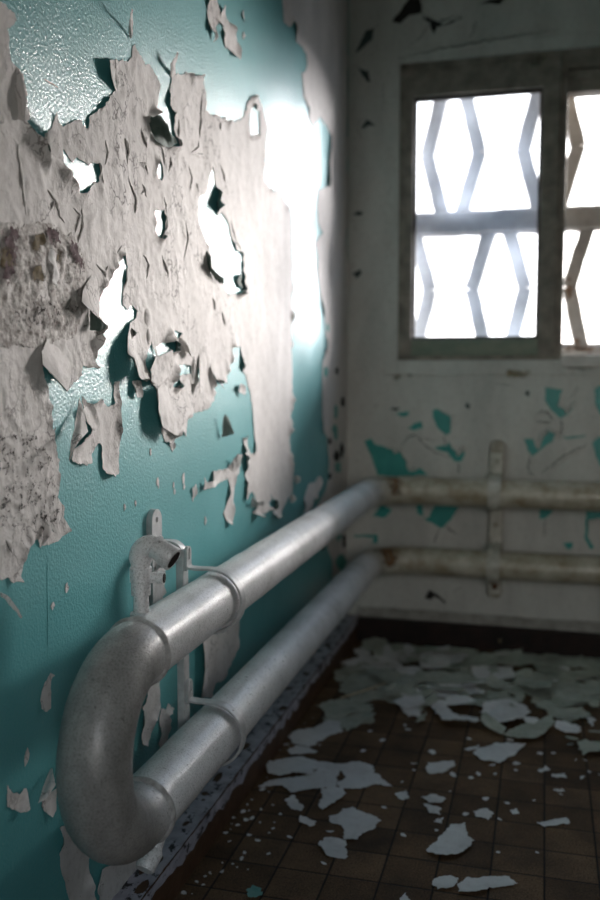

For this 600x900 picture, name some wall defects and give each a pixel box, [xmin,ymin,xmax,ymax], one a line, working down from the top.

peeling [392,0,463,34]
leakage [2,225,20,286]
leakage [46,227,85,272]
peeling [0,0,301,583]
leakage [12,301,78,328]
peeling [545,387,577,418]
peeling [365,438,428,476]
peeling [433,408,467,461]
peeling [524,427,600,465]
peeling [416,505,463,528]